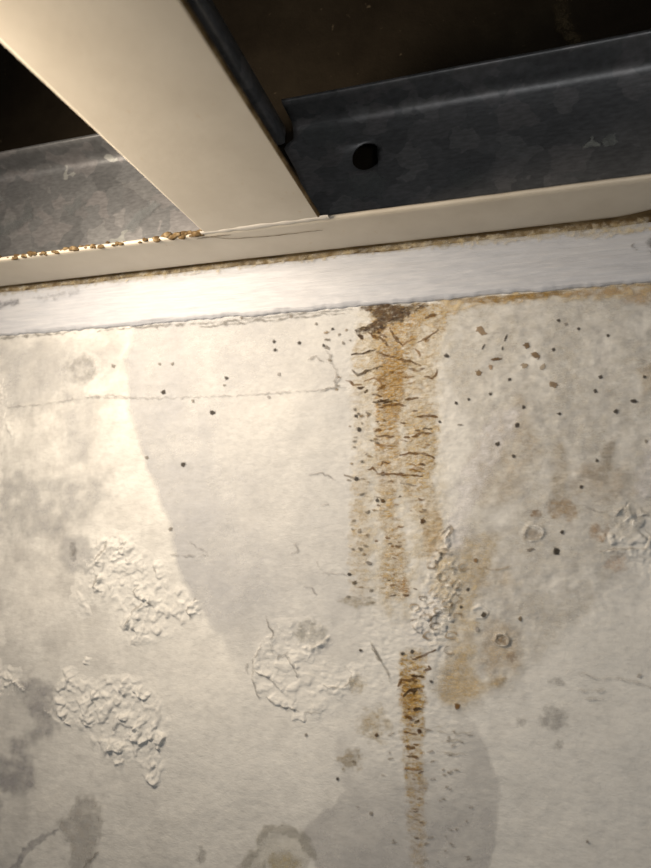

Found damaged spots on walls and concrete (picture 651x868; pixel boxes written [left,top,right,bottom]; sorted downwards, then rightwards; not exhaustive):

leakage [128,322,194,436]
rust [350,284,651,596]
rust [398,649,436,823]